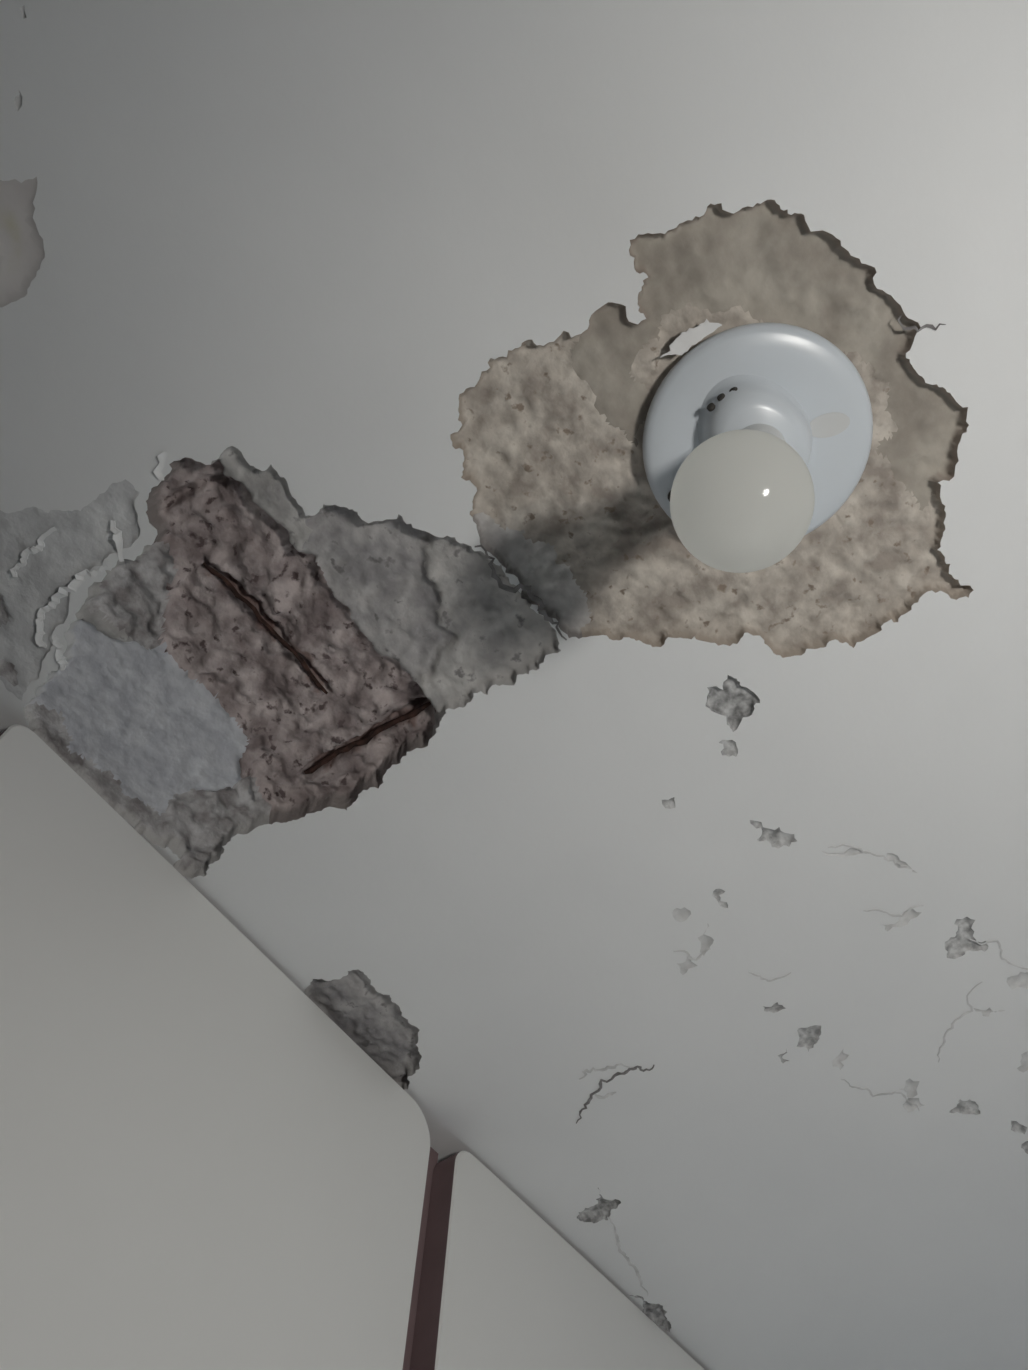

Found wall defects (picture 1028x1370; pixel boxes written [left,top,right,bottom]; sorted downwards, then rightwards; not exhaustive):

peeling [0,177,45,307]
spalling [0,199,973,879]
peeling [712,889,728,908]
peeling [673,925,714,975]
peeling [945,917,1028,990]
spalling [304,970,422,1090]
peeling [763,1002,786,1013]
peeling [778,1025,821,1063]
crack [576,1063,654,1124]
peeling [832,1048,924,1113]
peeling [949,1099,980,1115]
peeling [1011,1121,1028,1154]